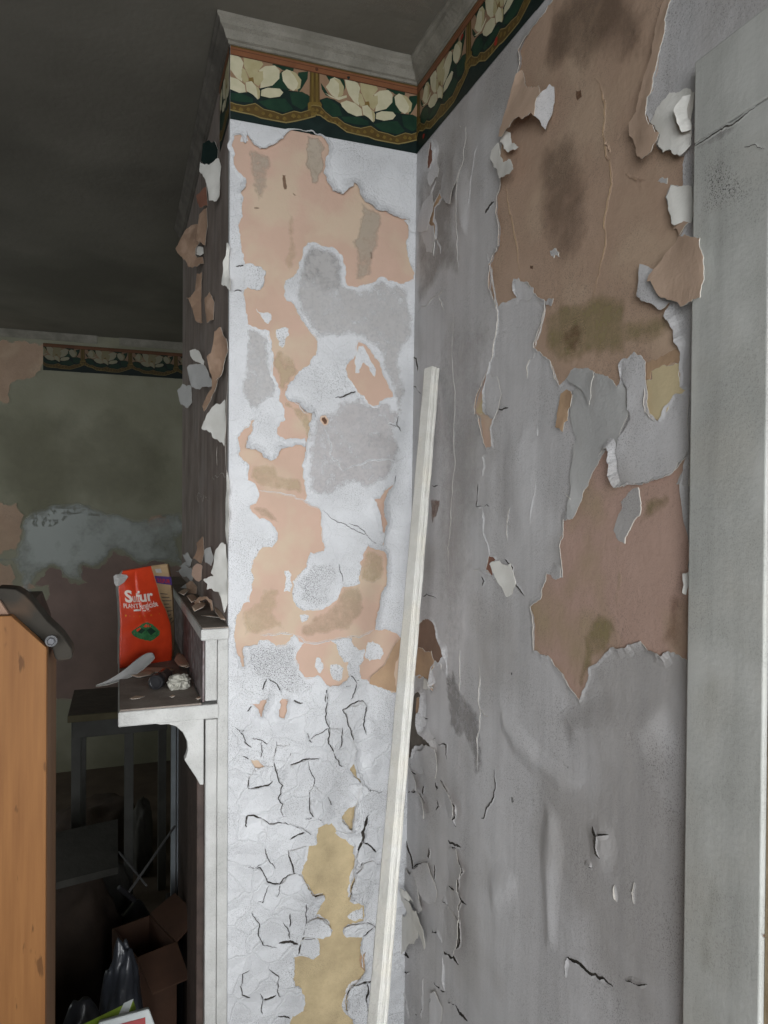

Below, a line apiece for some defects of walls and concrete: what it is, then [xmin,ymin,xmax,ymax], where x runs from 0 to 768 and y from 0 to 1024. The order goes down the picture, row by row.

leakage [17,505,182,588]
peeling [0,124,442,701]
peeling [472,0,704,699]
crack [235,663,382,1020]
peeling [286,745,370,1024]
crack [403,650,497,1024]
crack [564,955,648,989]